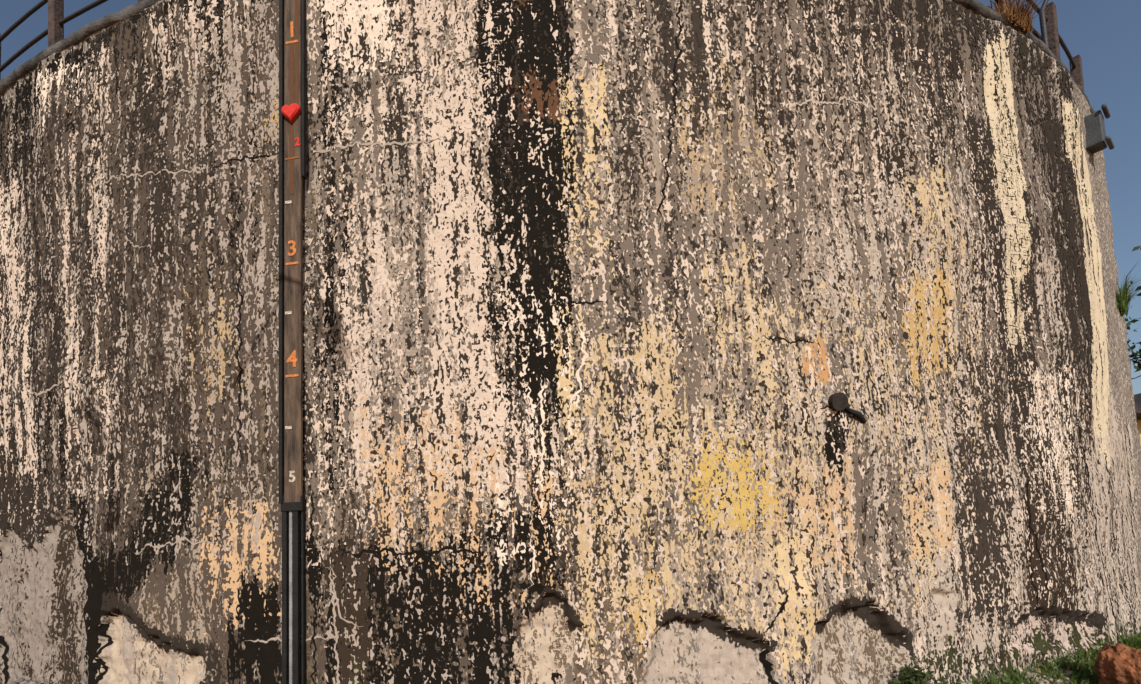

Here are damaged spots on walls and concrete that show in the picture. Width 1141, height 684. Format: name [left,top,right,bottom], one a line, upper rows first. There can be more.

spalling [0,0,282,684]
leakage [302,0,1141,684]
peeling [302,0,1141,684]
crack [759,585,790,684]